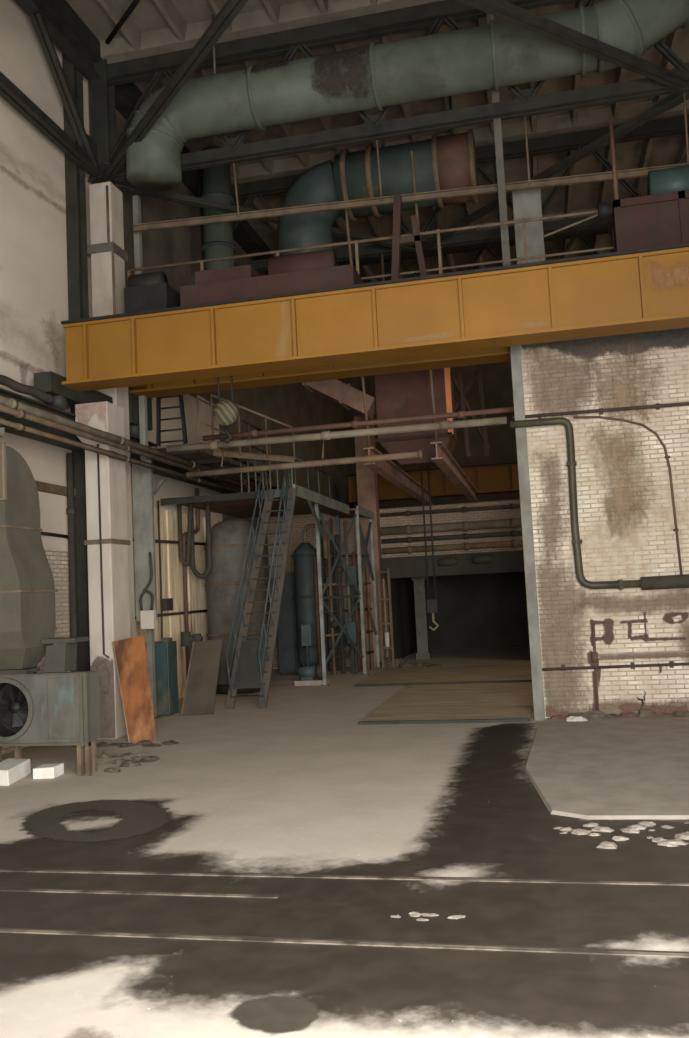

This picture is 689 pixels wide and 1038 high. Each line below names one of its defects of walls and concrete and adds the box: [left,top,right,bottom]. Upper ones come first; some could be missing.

leakage [531,352,658,418]
leakage [599,431,647,531]
corrosion [587,612,689,711]
leakage [0,723,689,1036]